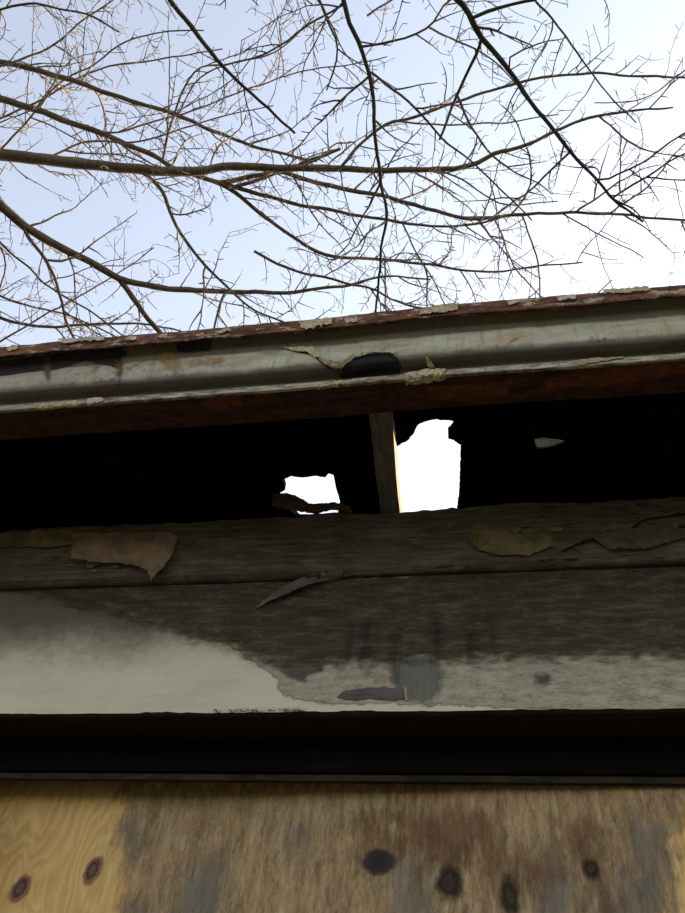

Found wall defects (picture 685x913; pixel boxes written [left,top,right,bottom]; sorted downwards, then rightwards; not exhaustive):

spalling [282,345,446,390]
peeling [574,356,625,366]
rust [541,361,685,390]
peeling [34,397,105,411]
peeling [0,528,195,581]
peeling [468,514,555,560]
peeling [338,686,408,701]
leakage [116,782,685,913]